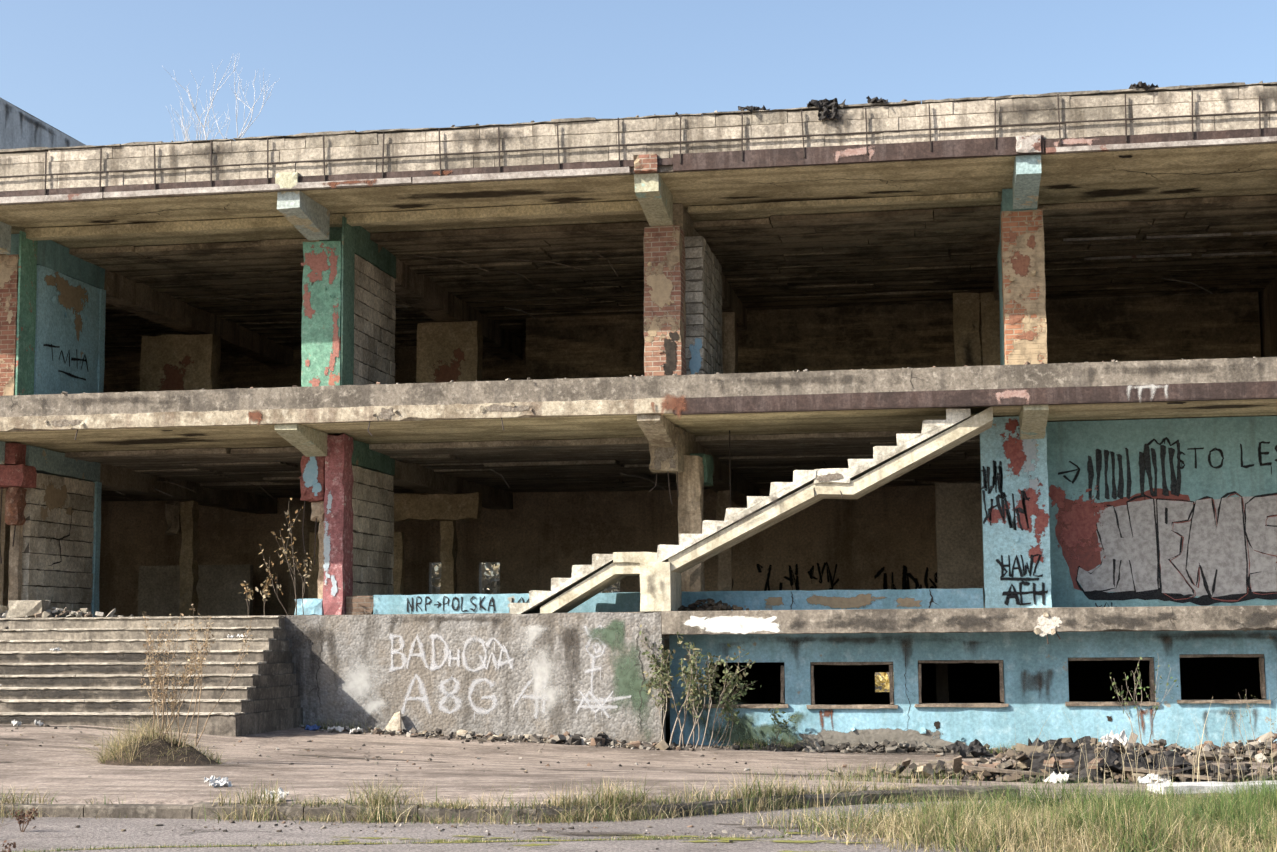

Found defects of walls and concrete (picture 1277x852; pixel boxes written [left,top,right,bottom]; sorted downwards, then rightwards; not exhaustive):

flaking render [1007,231,1036,281]
flaking render [0,262,14,324]
peeling [44,271,88,341]
peeling [301,242,339,386]
flaking render [645,262,702,375]
peeling [987,418,1109,563]
peeling [299,456,337,596]
peeling [684,597,784,634]
leakage [786,621,809,653]
peeling [806,593,922,609]
leakage [827,616,910,661]
leakage [1023,671,1052,689]